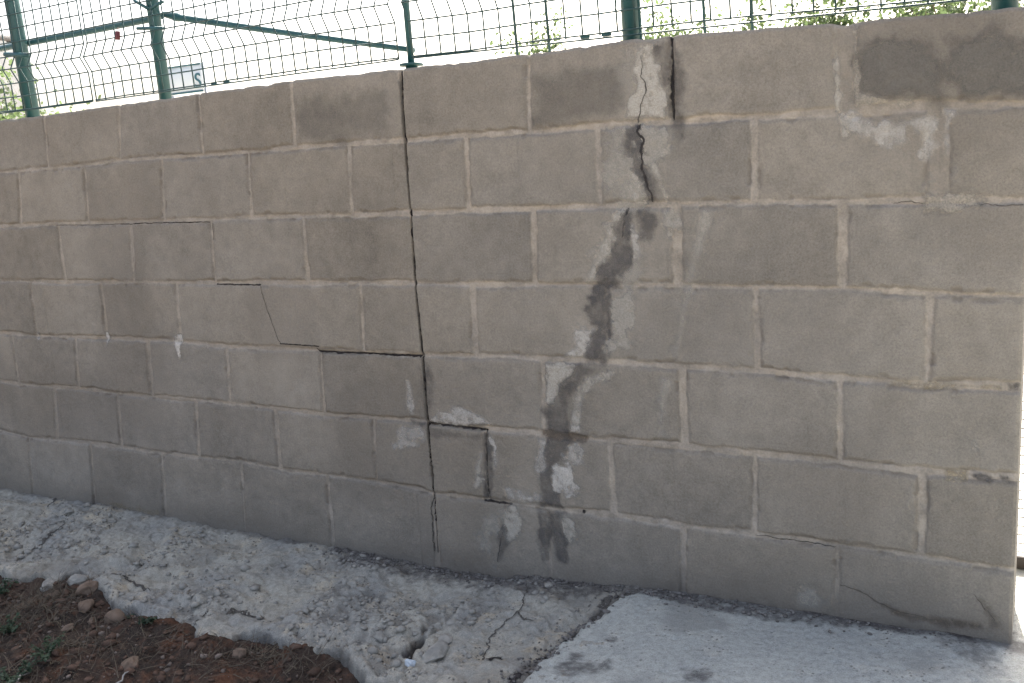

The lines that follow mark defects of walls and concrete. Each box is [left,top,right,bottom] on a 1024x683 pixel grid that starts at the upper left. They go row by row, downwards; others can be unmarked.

crack [400,72,408,160]
damp [625,126,651,190]
crack [622,38,675,237]
damp [839,31,1024,159]
crack [96,209,513,561]
damp [535,211,656,563]
crack [841,585,994,626]